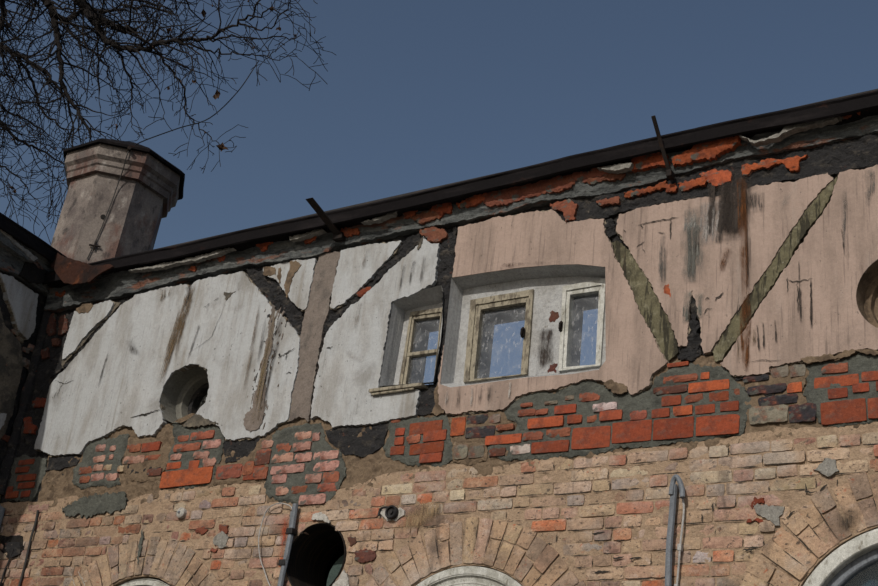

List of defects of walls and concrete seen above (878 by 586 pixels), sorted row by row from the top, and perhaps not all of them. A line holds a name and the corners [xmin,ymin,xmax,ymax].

spalling [402,135,808,250]
water stain [684,201,722,277]
flaking render [0,303,93,442]
flaking render [72,260,347,506]
flaking render [383,349,878,467]
flaking render [5,455,48,502]